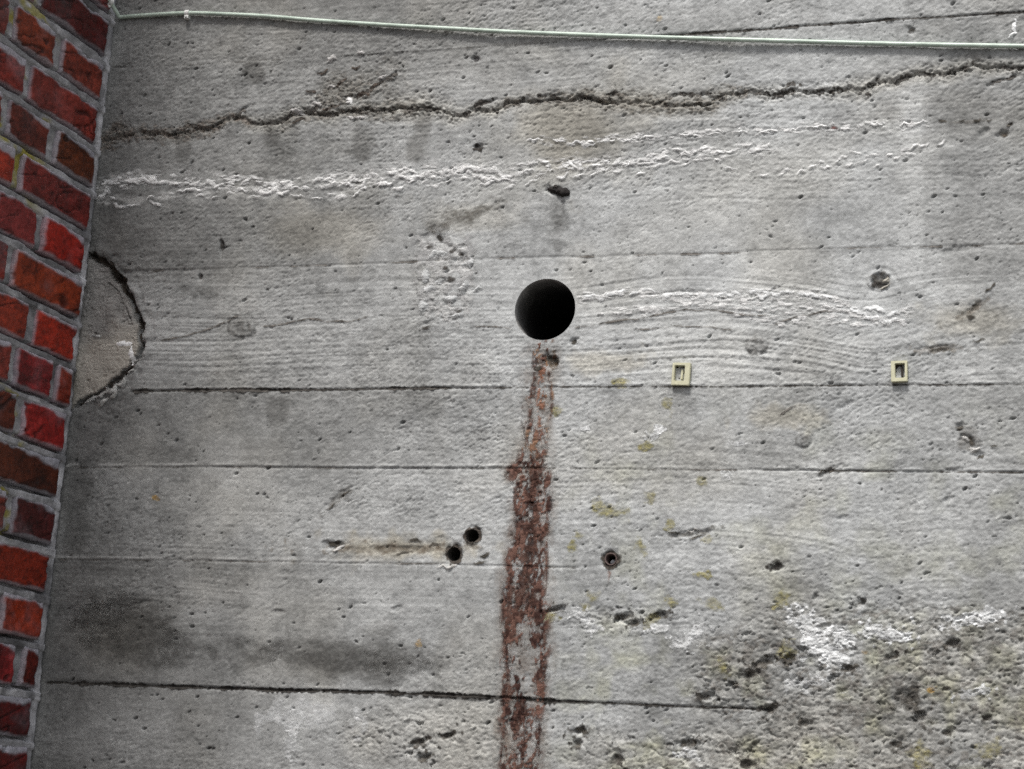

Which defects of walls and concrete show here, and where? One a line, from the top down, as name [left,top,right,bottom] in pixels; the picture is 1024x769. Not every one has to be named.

crack [672,10,1024,36]
crack [106,50,1024,142]
efflorescence [96,119,885,208]
efflorescence [780,140,944,174]
spalling [72,251,146,408]
efflorescence [578,288,912,327]
corrosion [499,339,554,769]
efflorescence [785,602,921,686]
efflorescence [939,603,1017,631]